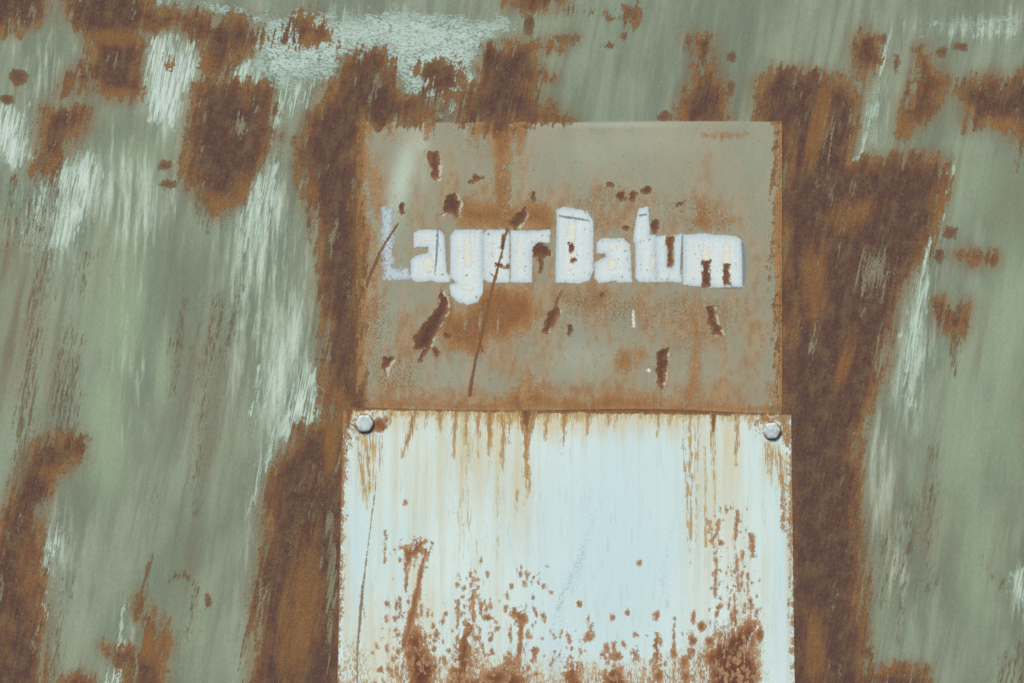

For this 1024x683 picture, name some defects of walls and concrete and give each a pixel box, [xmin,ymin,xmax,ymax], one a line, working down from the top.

corrosion [0,68,29,105]
corrosion [4,174,51,247]
corrosion [28,102,94,197]
corrosion [59,0,341,234]
corrosion [240,0,958,683]
corrosion [930,292,973,377]
corrosion [0,242,96,683]
corrosion [101,551,212,683]